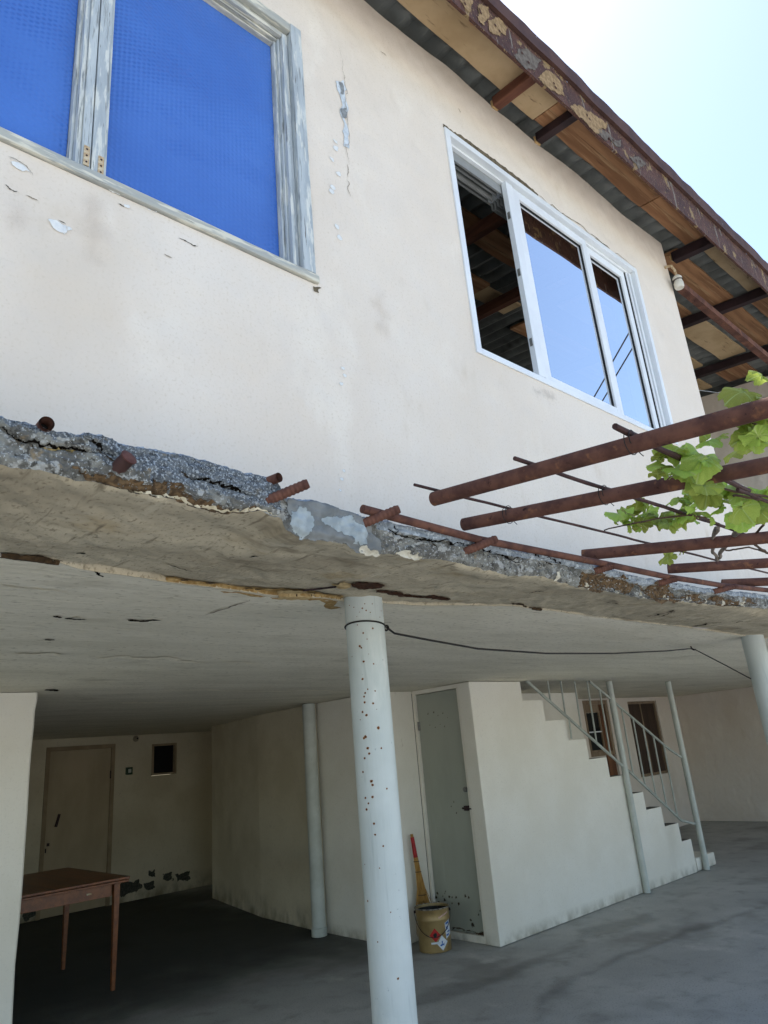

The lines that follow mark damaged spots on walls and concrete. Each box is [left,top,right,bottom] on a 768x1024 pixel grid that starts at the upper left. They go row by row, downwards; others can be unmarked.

spalling [72,466,277,516]
spalling [0,553,60,565]
peeling [120,869,191,897]